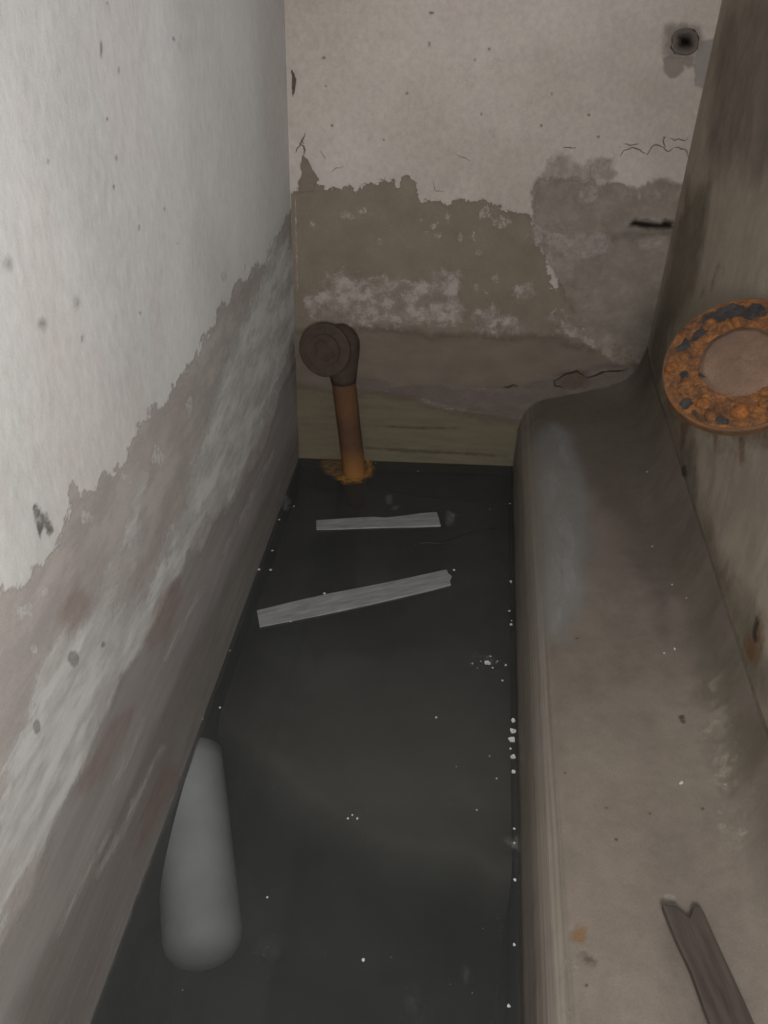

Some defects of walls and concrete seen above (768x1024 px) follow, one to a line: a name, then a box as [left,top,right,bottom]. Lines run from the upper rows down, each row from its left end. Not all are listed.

spalling [666,27,700,56]
crack [620,137,688,157]
crack [553,368,628,388]
corrosion [664,299,768,428]
peeling [0,158,682,957]
leakage [303,192,705,1024]
leakage [0,331,341,1024]